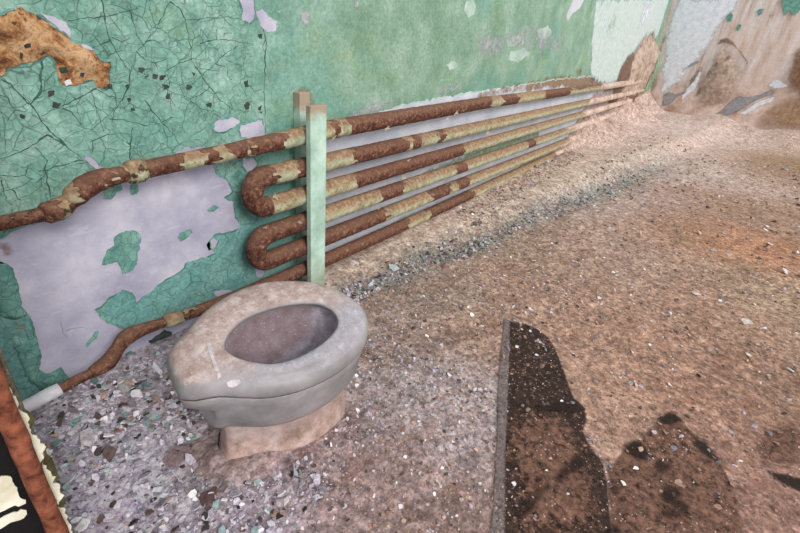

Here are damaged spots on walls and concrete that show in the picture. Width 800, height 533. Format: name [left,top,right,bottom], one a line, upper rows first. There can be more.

peeling [237,0,277,39]
peeling [782,0,800,16]
crack [0,0,267,205]
peeling [212,102,265,138]
peeling [325,0,741,252]
corrosion [479,71,601,97]
peeling [716,79,787,115]
peeling [0,154,258,391]